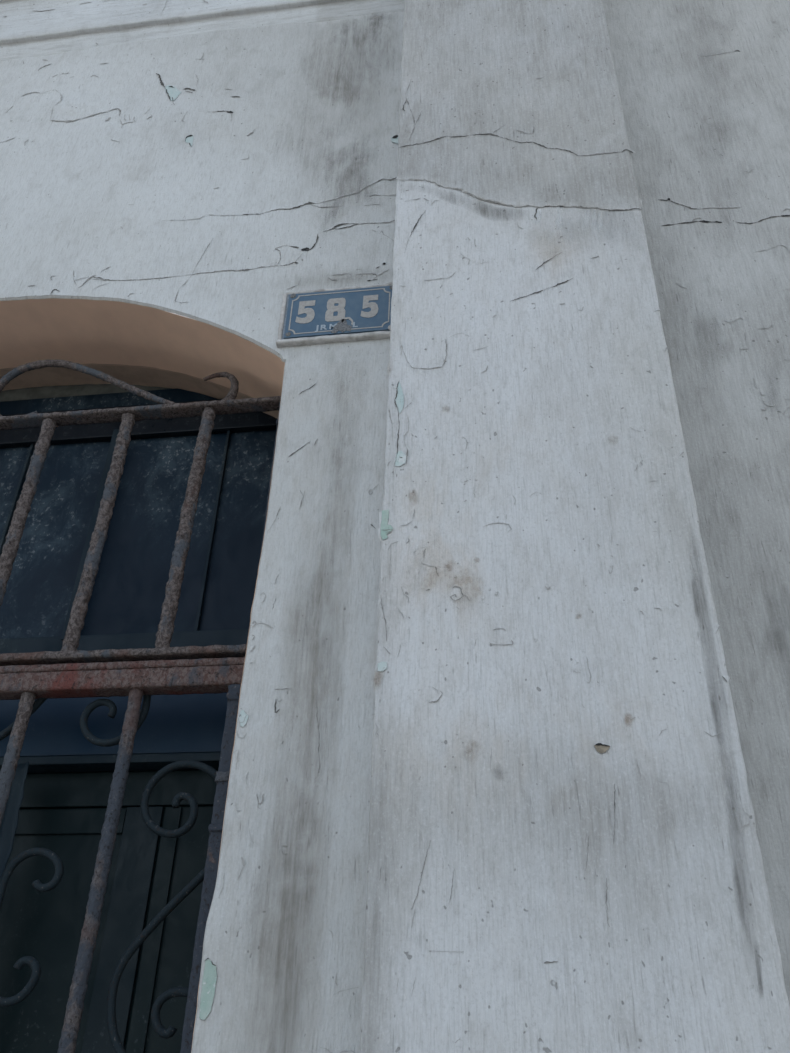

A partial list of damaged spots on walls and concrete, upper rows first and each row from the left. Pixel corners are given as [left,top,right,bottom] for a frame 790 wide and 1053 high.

crack [398,127,635,156]
crack [30,176,437,305]
crack [658,198,790,226]
peeling [387,381,412,474]
peeling [199,957,219,1021]